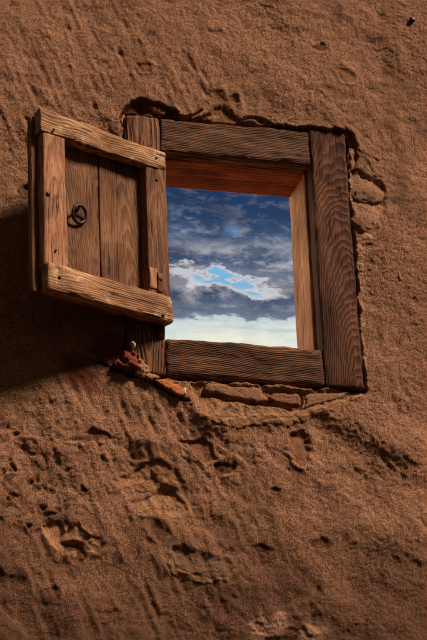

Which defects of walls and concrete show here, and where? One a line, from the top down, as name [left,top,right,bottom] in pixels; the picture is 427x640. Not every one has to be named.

spalling [112,126,390,428]